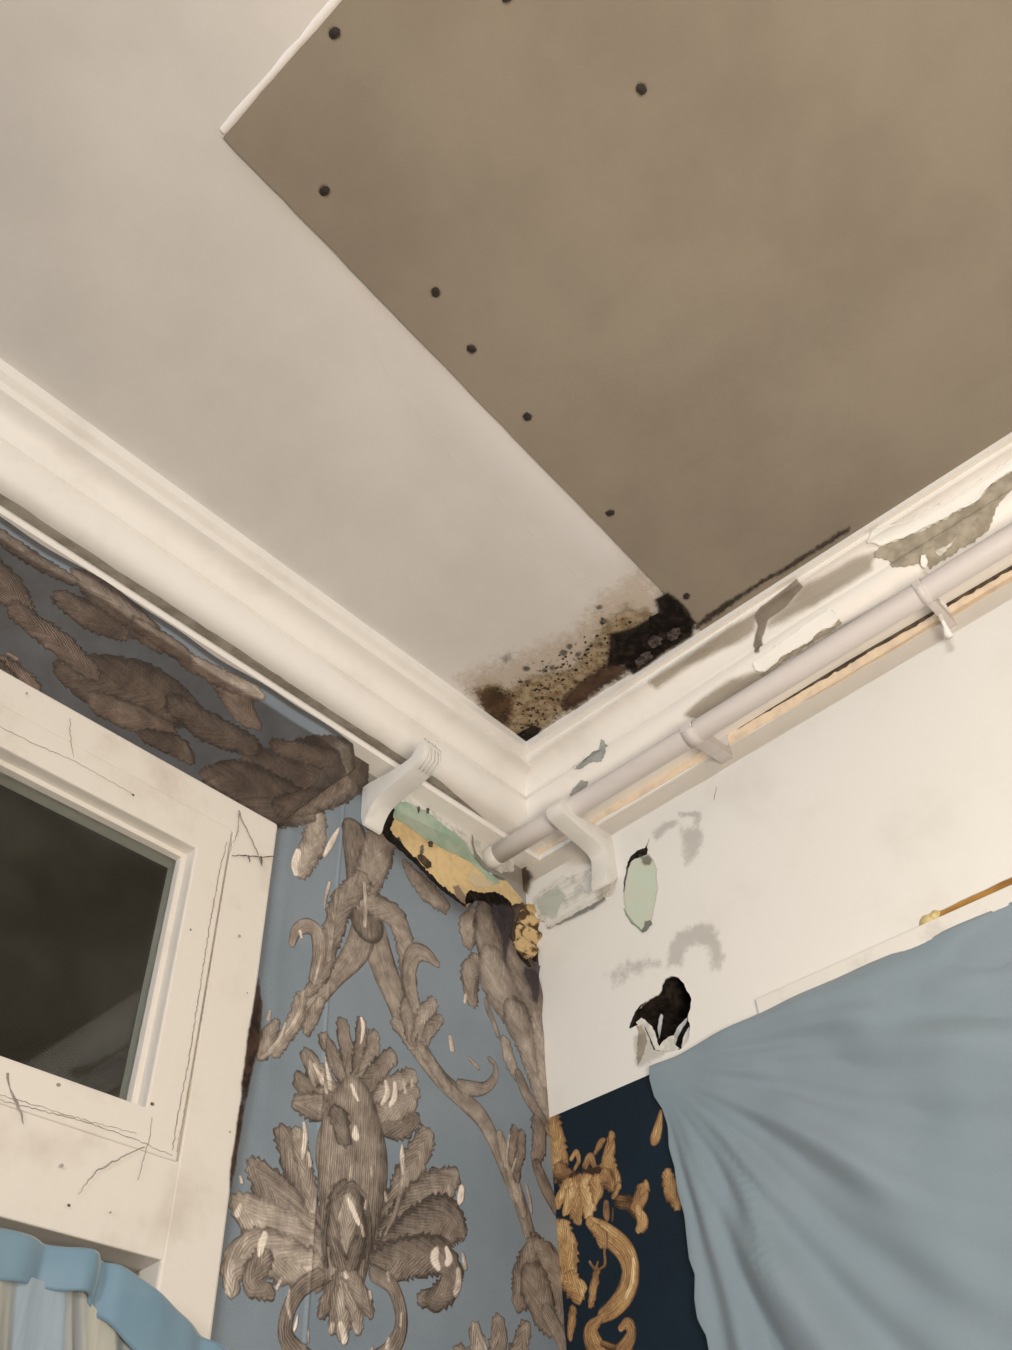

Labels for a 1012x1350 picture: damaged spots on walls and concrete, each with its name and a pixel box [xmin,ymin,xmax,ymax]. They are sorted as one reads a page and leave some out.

peeling [866,459,1012,570]
leakage [474,605,651,741]
spalling [608,593,695,674]
flaking render [727,565,1012,745]
peeling [570,739,608,796]
flaking render [589,751,709,823]
spalling [382,796,523,908]
peeling [623,840,657,932]
spalling [629,977,691,1064]